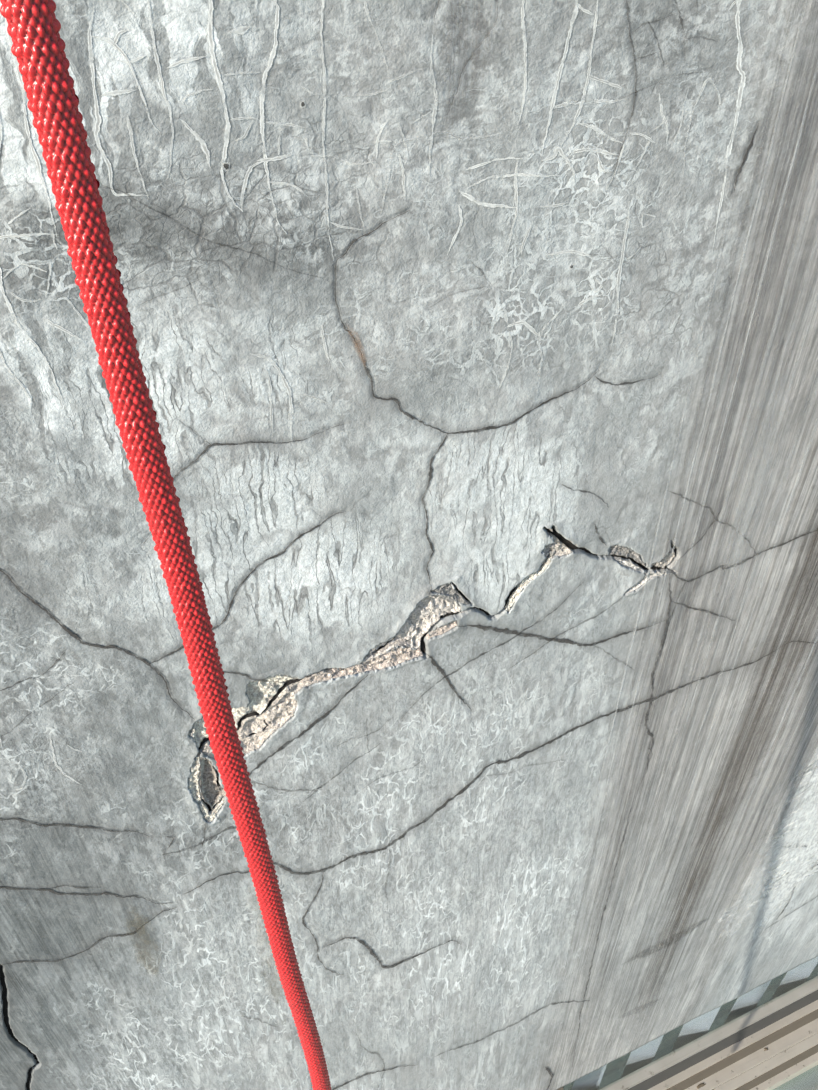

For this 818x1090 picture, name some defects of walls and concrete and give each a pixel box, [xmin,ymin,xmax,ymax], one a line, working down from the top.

leakage [0,18,69,250]
leakage [87,0,364,261]
leakage [447,0,711,255]
leakage [712,0,746,252]
leakage [0,264,64,402]
crack [173,424,343,479]
crack [335,210,660,595]
leakage [610,201,656,349]
spalling [188,718,226,822]
spalling [231,582,490,755]
crack [0,506,818,1090]
spalling [504,526,677,612]